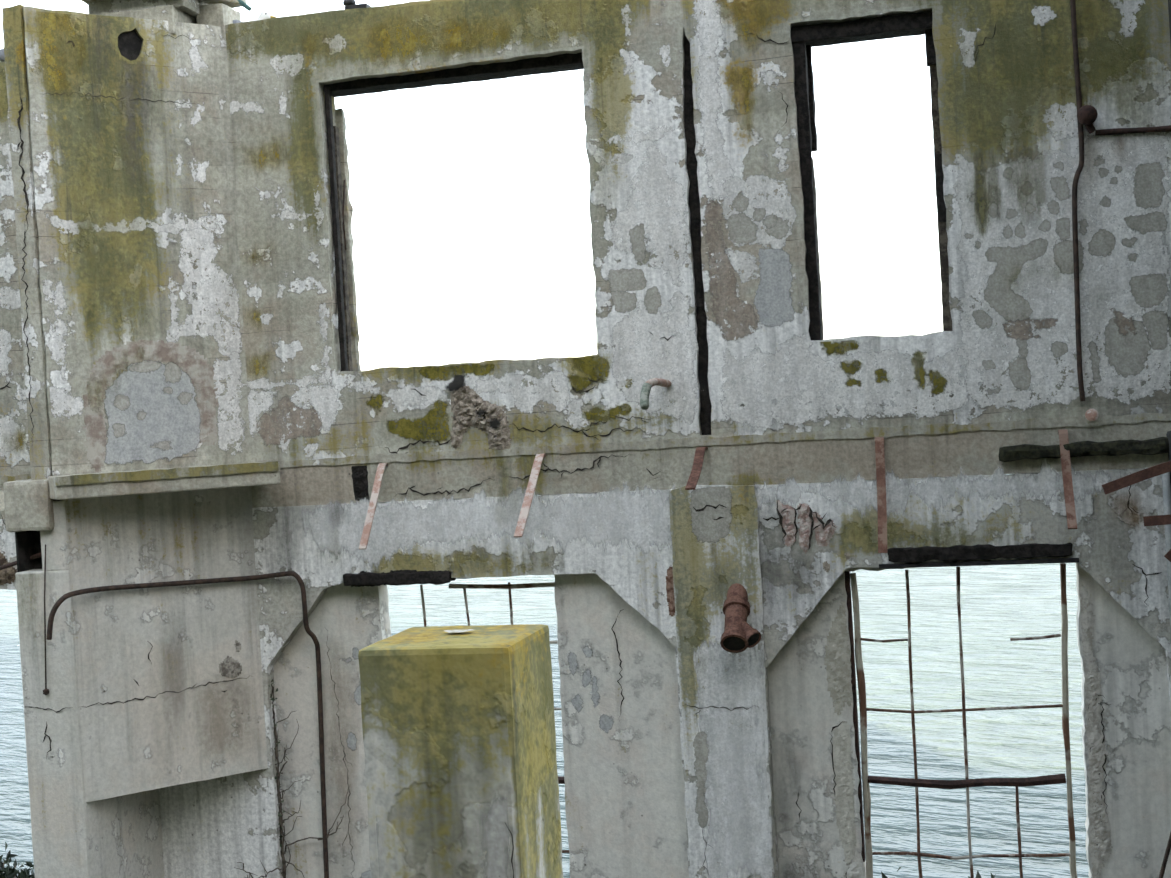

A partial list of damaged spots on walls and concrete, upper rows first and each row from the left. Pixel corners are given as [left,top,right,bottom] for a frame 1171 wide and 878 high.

peeling [270,53,305,77]
peeling [324,34,347,55]
peeling [620,4,636,76]
peeling [175,98,209,183]
peeling [692,0,1171,431]
leakage [974,153,1000,235]
crack [0,92,199,445]
peeling [43,126,704,460]
peeling [0,329,12,375]
peeling [755,460,1110,554]
spalling [0,537,17,586]
crack [1133,564,1162,601]